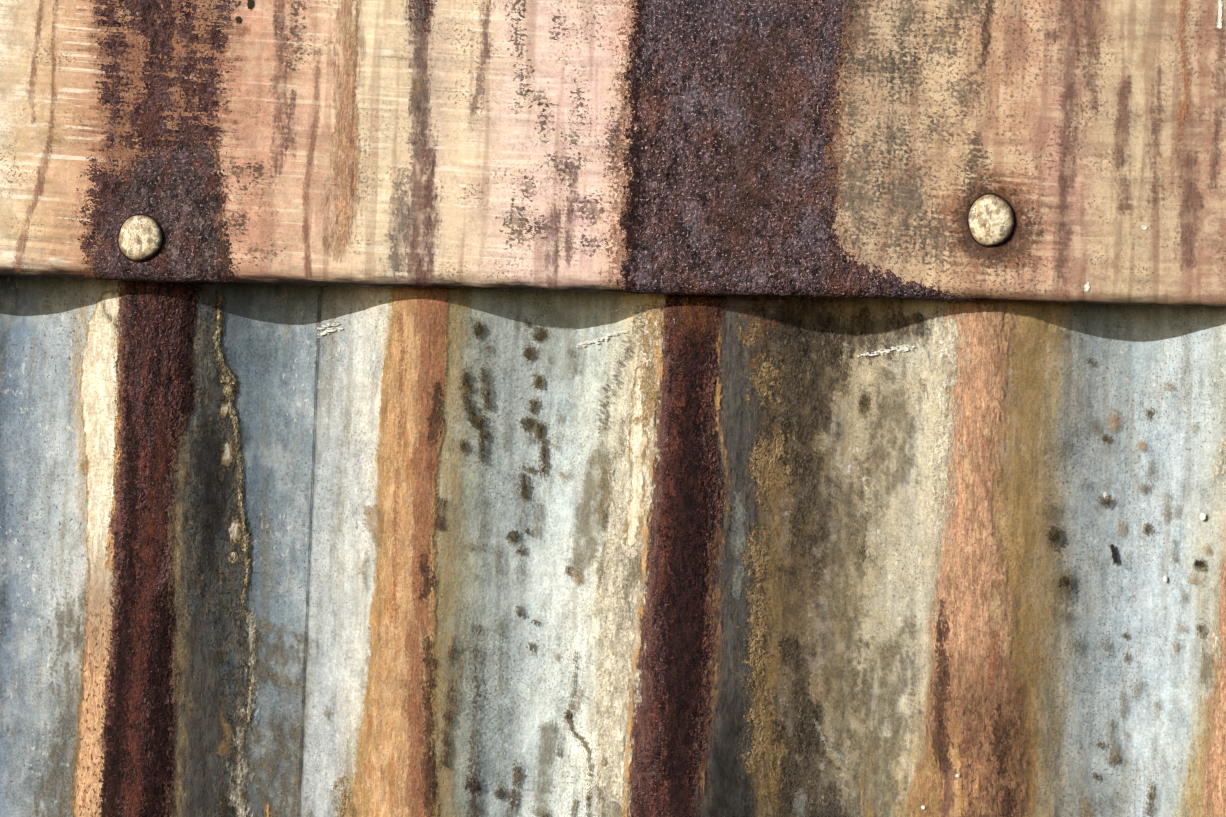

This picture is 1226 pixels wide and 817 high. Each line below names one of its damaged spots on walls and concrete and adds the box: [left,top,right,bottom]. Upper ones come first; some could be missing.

rust [76,0,248,817]
rust [333,0,449,817]
rust [599,0,1063,817]
rust [1055,568,1073,624]
leakage [762,628,859,817]
rust [1095,689,1139,764]
rust [1145,782,1155,815]